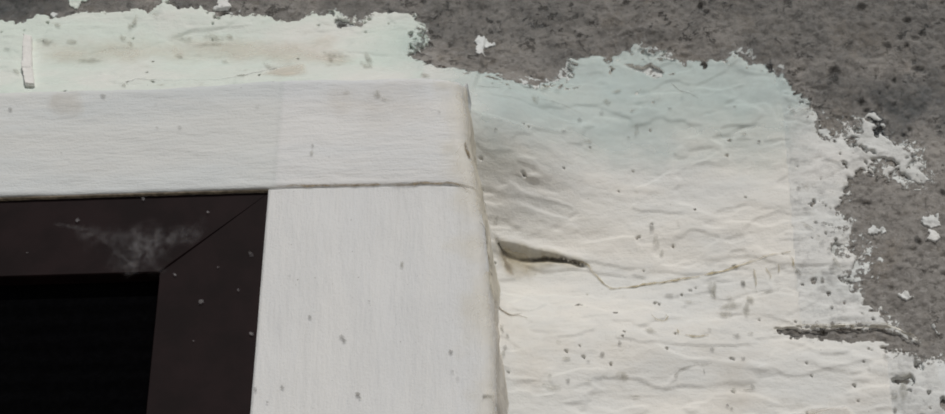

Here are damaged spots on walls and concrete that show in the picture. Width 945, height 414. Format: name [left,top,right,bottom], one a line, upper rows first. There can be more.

peeling [0,0,430,93]
peeling [519,58,581,91]
peeling [624,41,678,79]
peeling [699,47,756,70]
peeling [421,64,945,414]
crack [580,251,794,289]